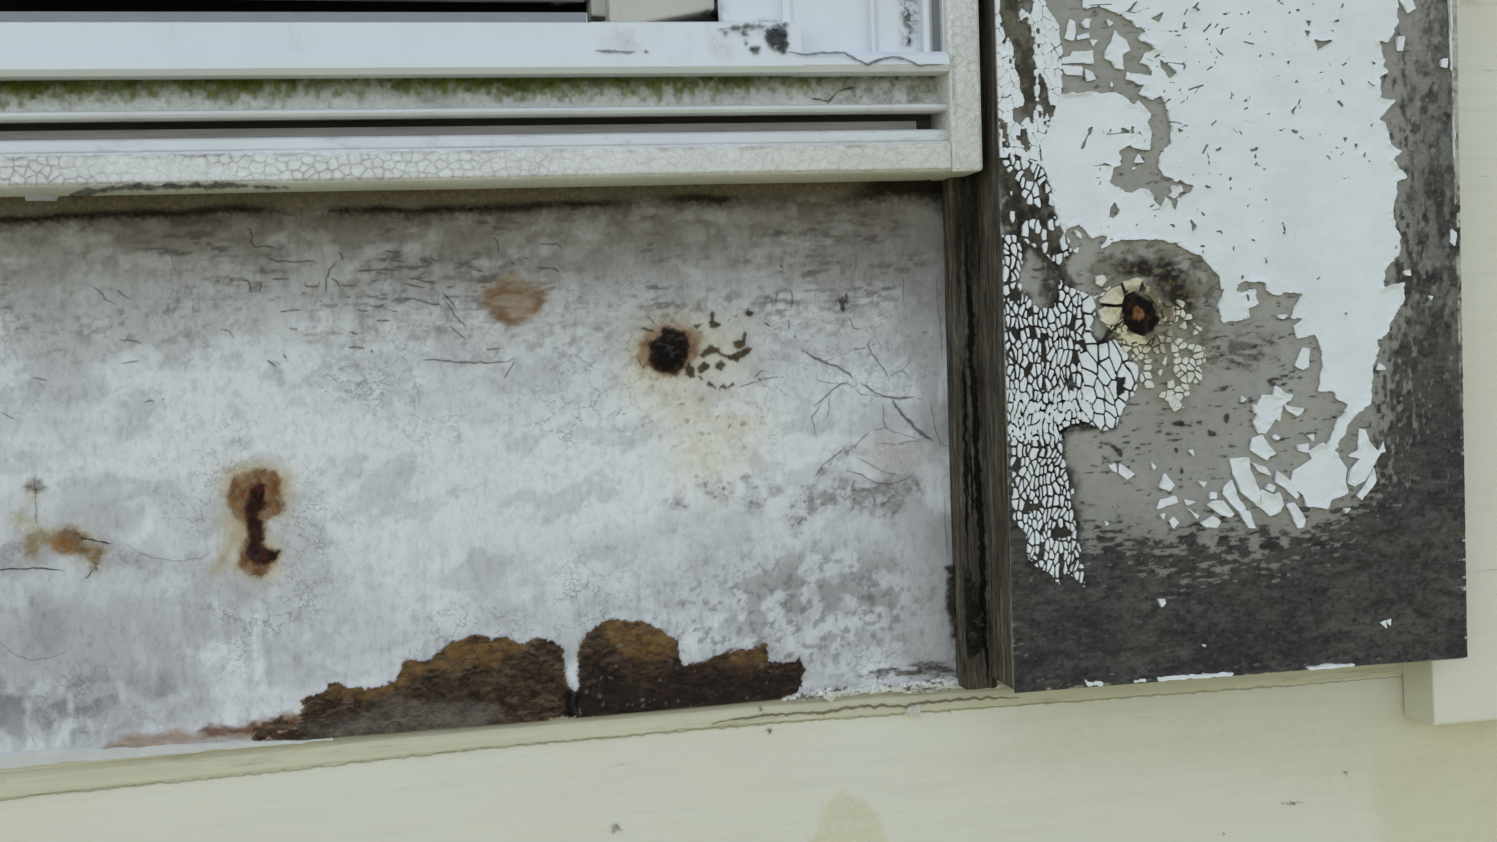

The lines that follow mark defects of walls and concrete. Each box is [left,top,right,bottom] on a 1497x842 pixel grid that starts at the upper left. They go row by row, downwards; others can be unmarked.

leakage [697,10,789,53]
leakage [902,3,915,45]
peeling [1439,0,1453,70]
peeling [999,0,1416,529]
rust [485,281,545,325]
rust [637,309,775,389]
rust [0,526,110,578]
rust [228,469,284,577]
peeling [0,619,806,768]
peeling [1134,672,1233,683]